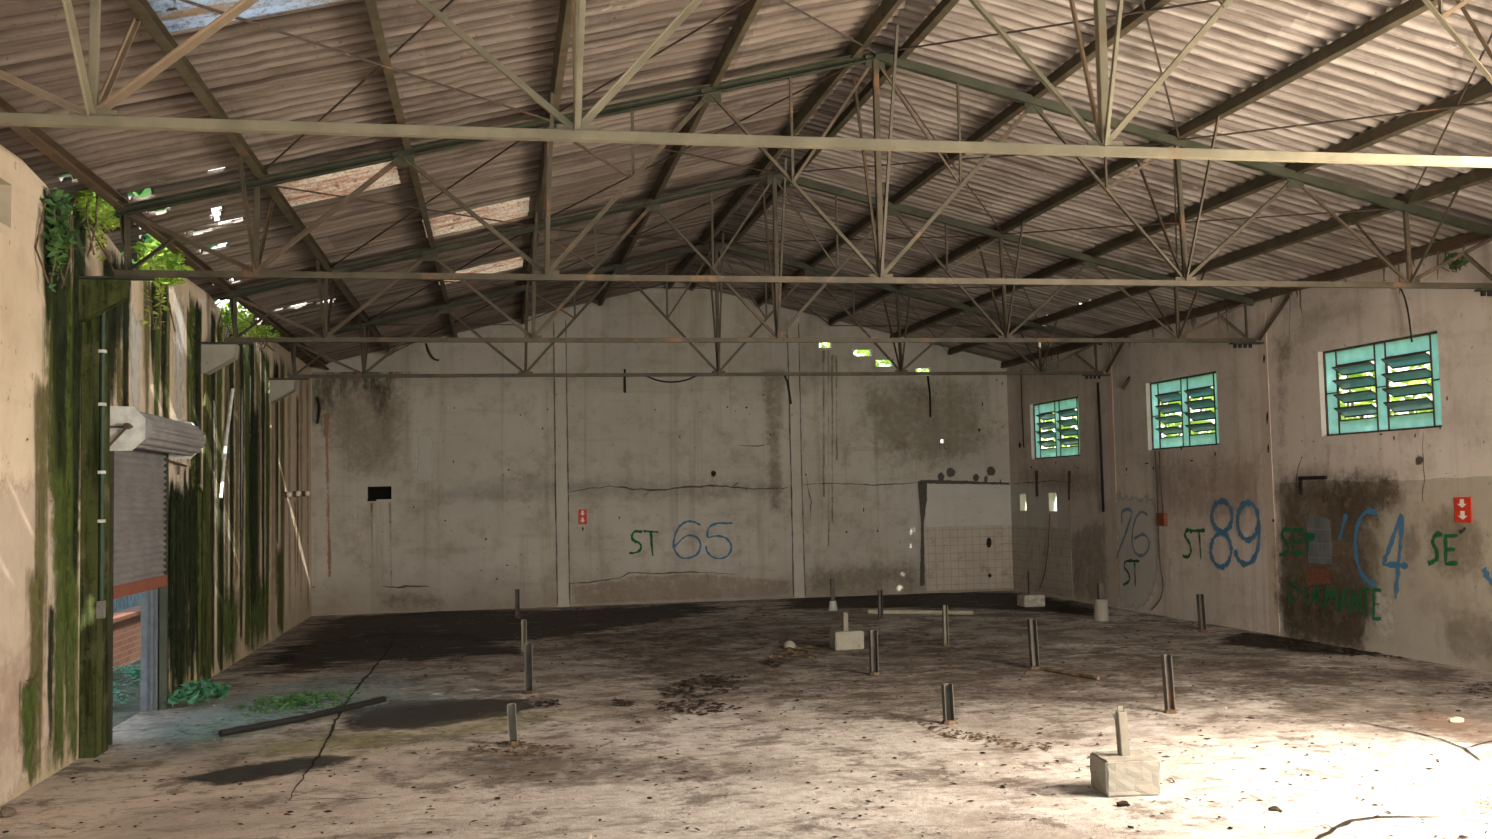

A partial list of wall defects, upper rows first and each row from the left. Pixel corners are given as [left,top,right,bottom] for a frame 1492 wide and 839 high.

leakage [1222,479,1398,656]
crack [288,634,397,801]